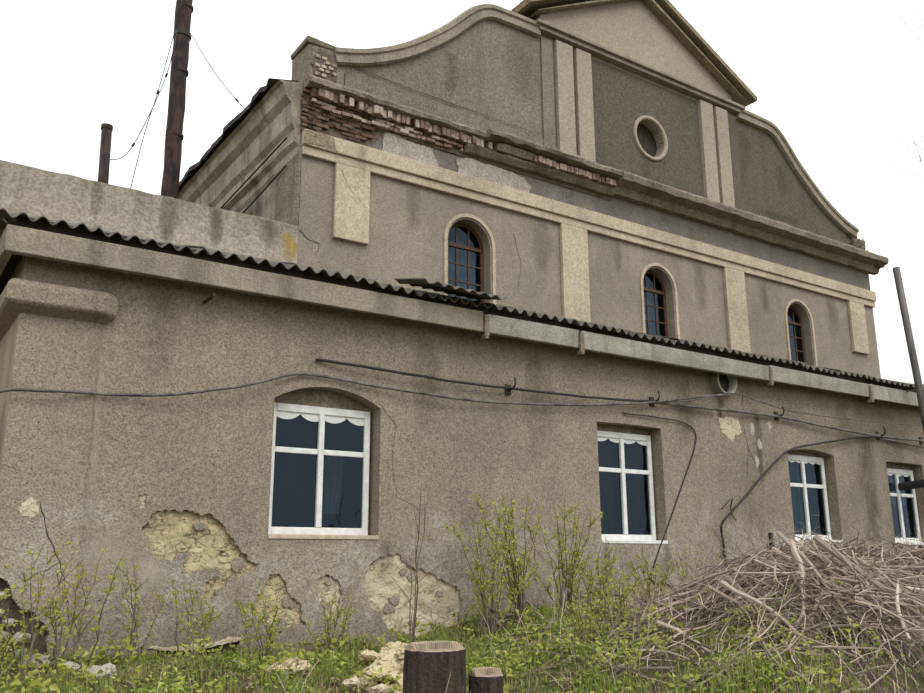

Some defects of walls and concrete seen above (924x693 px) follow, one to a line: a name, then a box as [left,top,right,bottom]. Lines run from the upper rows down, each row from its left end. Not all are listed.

flaking render [300,87,617,201]
peeling [712,410,762,468]
flaking render [0,578,48,661]
peeling [18,497,40,519]
crack [24,504,70,625]
spalling [139,494,257,599]
spalling [255,574,304,633]
spalling [316,574,341,623]
peeling [364,553,461,638]